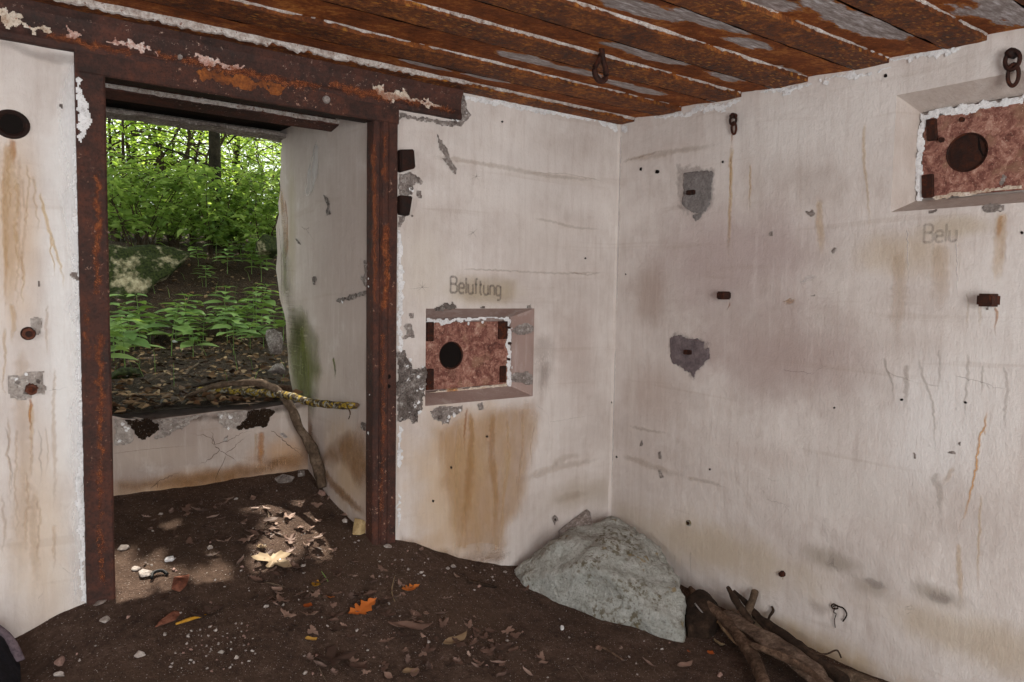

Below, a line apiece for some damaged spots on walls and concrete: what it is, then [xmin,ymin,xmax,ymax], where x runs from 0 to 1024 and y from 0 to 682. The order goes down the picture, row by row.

peeling [70,77,92,234]
spalling [398,172,423,198]
peeling [70,253,79,282]
spalling [396,215,534,468]
spalling [8,371,46,400]
spalling [113,415,200,446]
spalling [218,408,275,442]